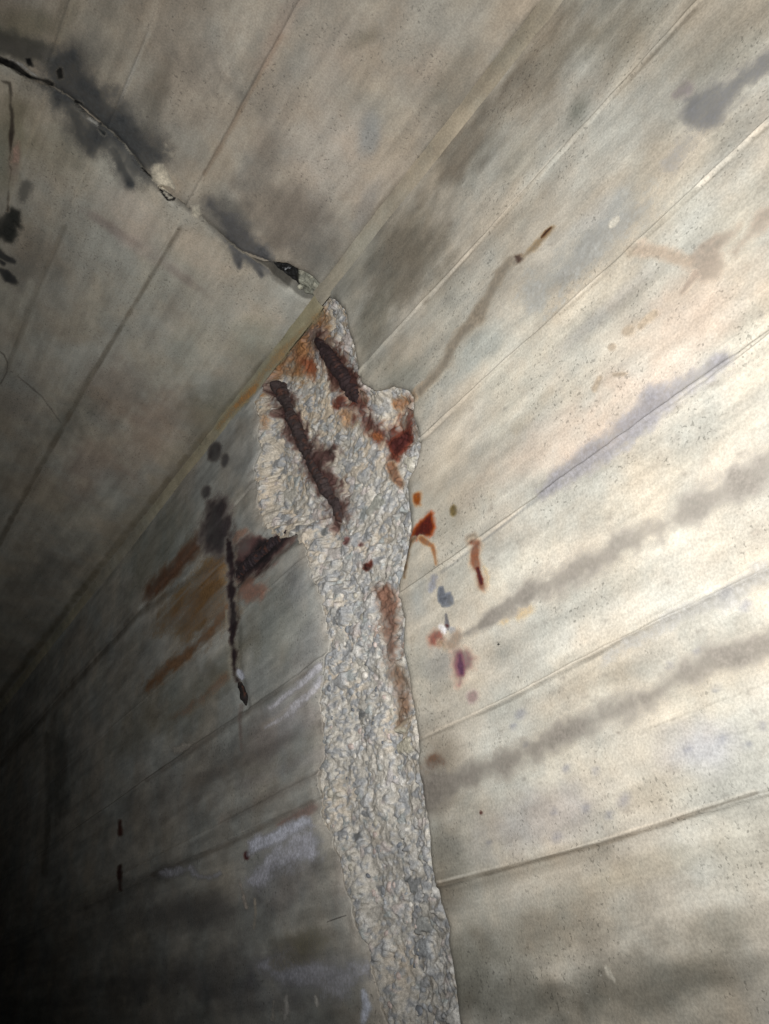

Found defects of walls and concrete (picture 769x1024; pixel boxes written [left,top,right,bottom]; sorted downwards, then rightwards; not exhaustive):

crack [0,56,107,212]
damp [0,28,172,190]
damp [662,50,769,171]
mould [0,180,33,285]
damp [205,195,275,278]
mould [207,441,229,467]
corrosion [216,305,437,579]
corrosion [142,494,297,693]
crack [225,537,245,735]
spalling [236,297,461,1024]
corrosion [371,581,412,728]
corrosion [465,533,488,593]